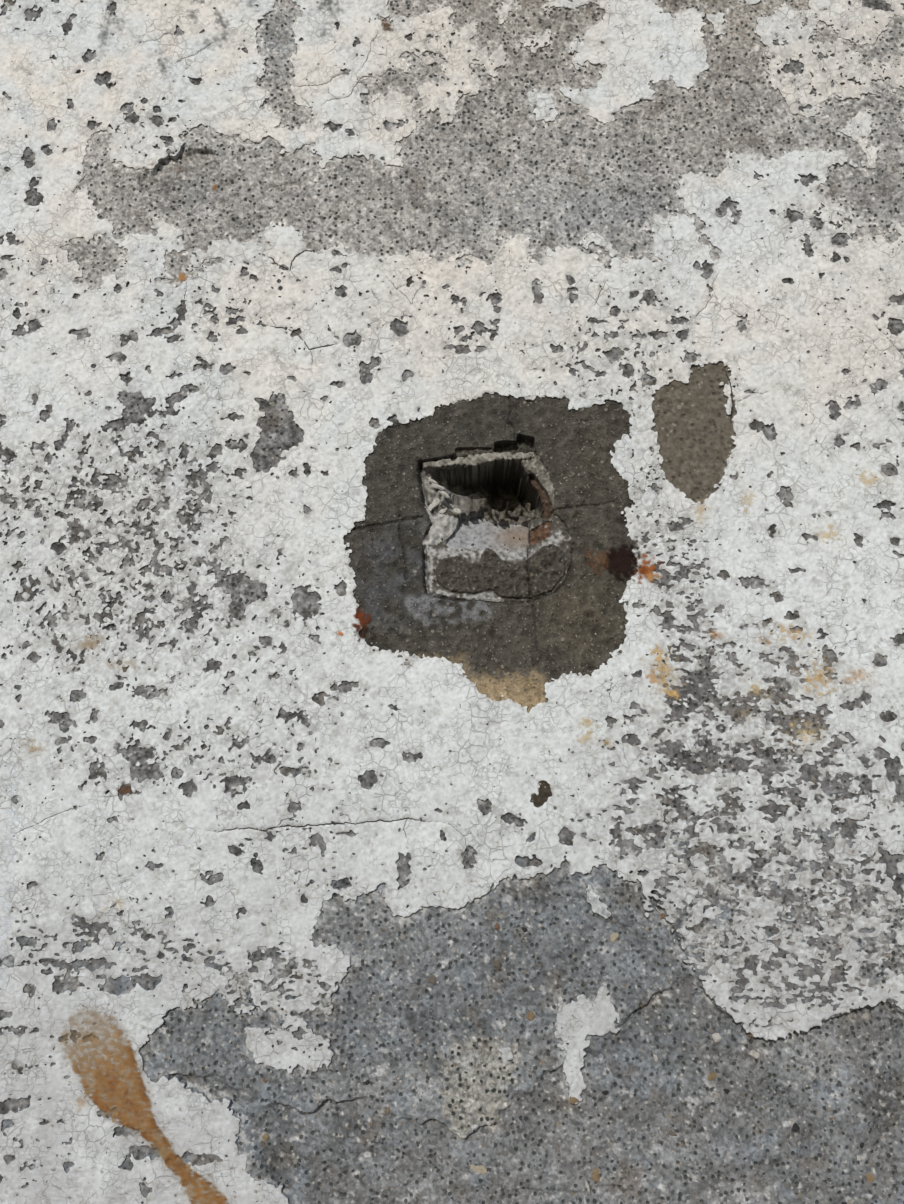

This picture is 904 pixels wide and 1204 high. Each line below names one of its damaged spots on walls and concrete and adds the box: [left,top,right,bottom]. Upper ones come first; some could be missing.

peeling [0,0,904,706]
rust [338,608,370,638]
rust [588,544,662,583]
spalling [0,290,904,1204]
rust [64,1015,235,1204]